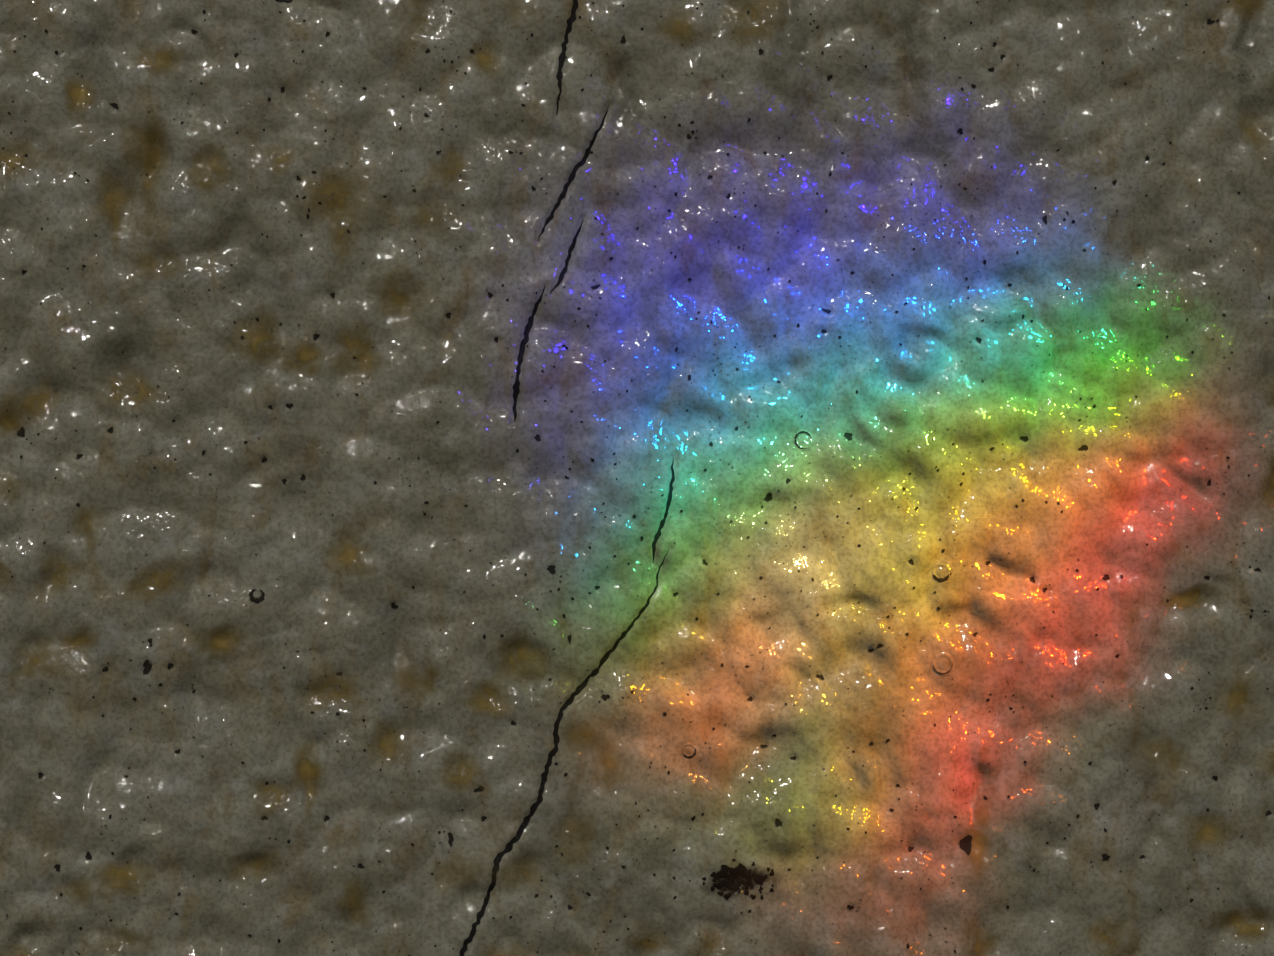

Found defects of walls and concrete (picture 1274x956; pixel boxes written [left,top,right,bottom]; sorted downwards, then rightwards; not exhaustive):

crack [556,0,579,116]
crack [512,105,609,422]
crack [459,459,675,956]